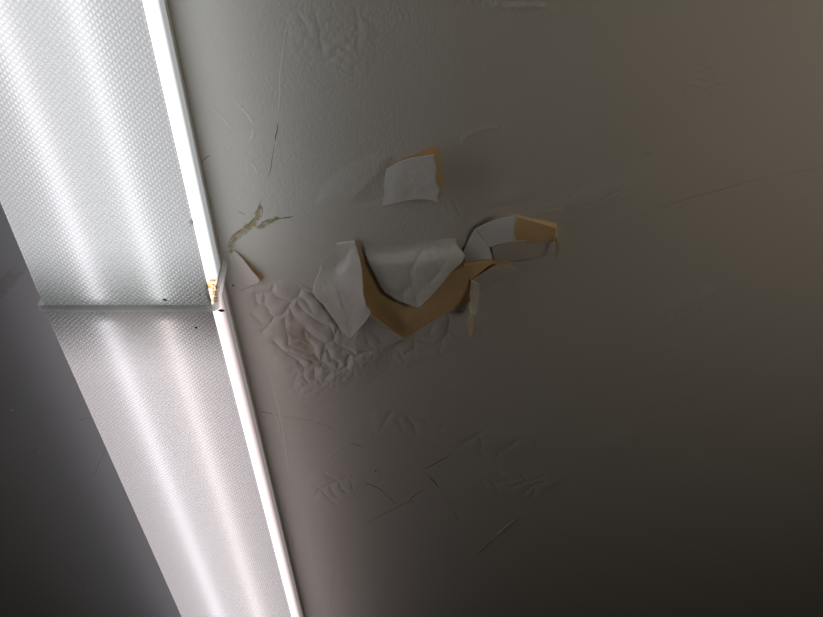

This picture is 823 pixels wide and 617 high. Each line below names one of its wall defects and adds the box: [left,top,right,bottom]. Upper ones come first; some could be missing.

peeling [313,214,560,352]